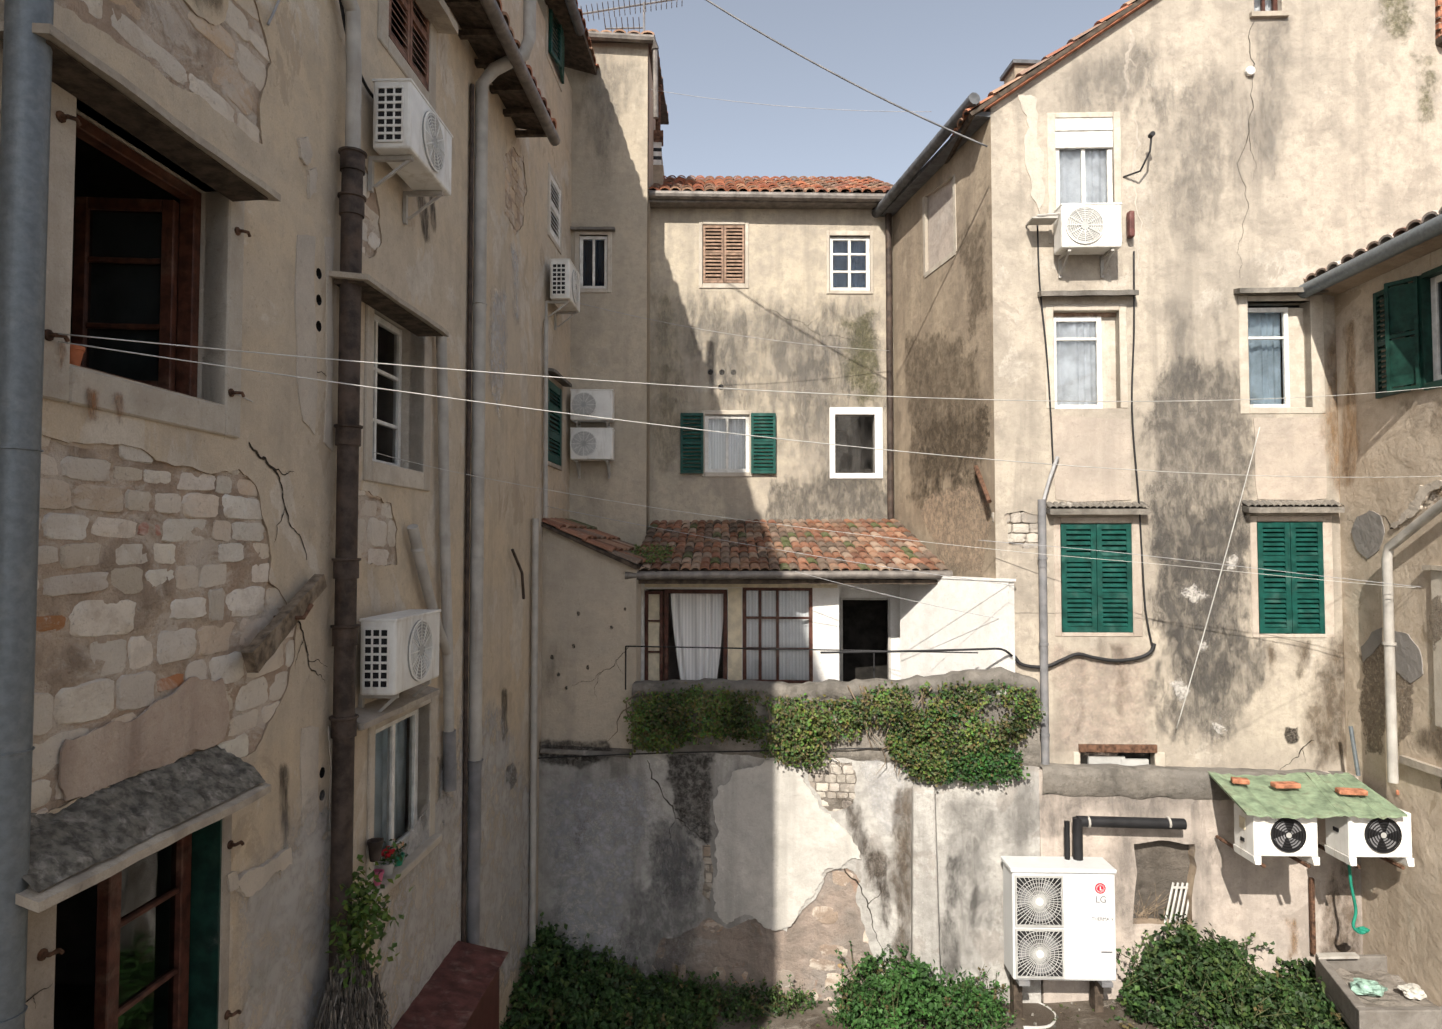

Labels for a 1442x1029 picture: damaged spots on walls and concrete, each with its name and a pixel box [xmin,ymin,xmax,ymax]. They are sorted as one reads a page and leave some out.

flaking render [54,0,270,144]
flaking render [362,170,380,258]
crack [1237,22,1257,271]
damp [844,317,878,404]
crack [249,442,307,560]
damp [768,478,887,520]
damp [1149,363,1262,737]
flaking render [31,435,295,815]
crack [295,621,328,681]
spalling [1359,596,1442,753]
damp [667,753,712,842]
peeling [711,758,861,931]